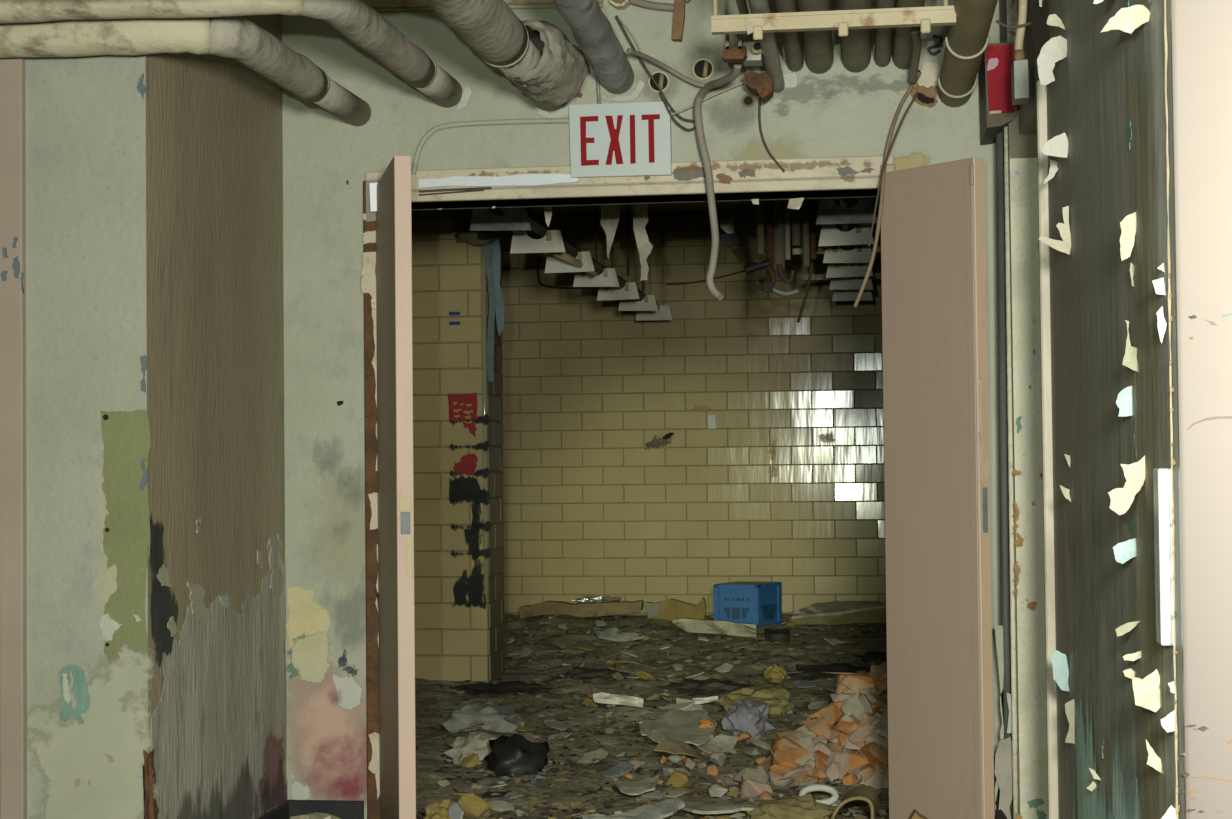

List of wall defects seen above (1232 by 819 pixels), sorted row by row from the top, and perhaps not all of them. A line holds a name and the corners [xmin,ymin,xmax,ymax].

peeling [1037,0,1067,86]
rust [672,165,755,184]
rust [837,166,874,176]
peeling [1040,133,1068,185]
peeling [543,206,552,227]
peeling [601,204,653,281]
peeling [787,197,804,209]
peeling [1036,206,1071,255]
peeling [1051,0,1176,819]
peeling [329,492,378,556]
peeling [27,410,362,819]
peeling [1026,798,1046,819]